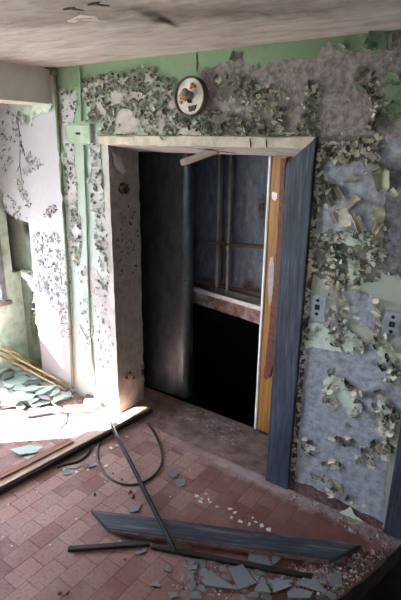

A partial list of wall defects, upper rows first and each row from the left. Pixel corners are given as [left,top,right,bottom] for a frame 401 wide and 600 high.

peeling [0,102,55,175]
peeling [0,177,31,219]
peeling [31,30,401,523]